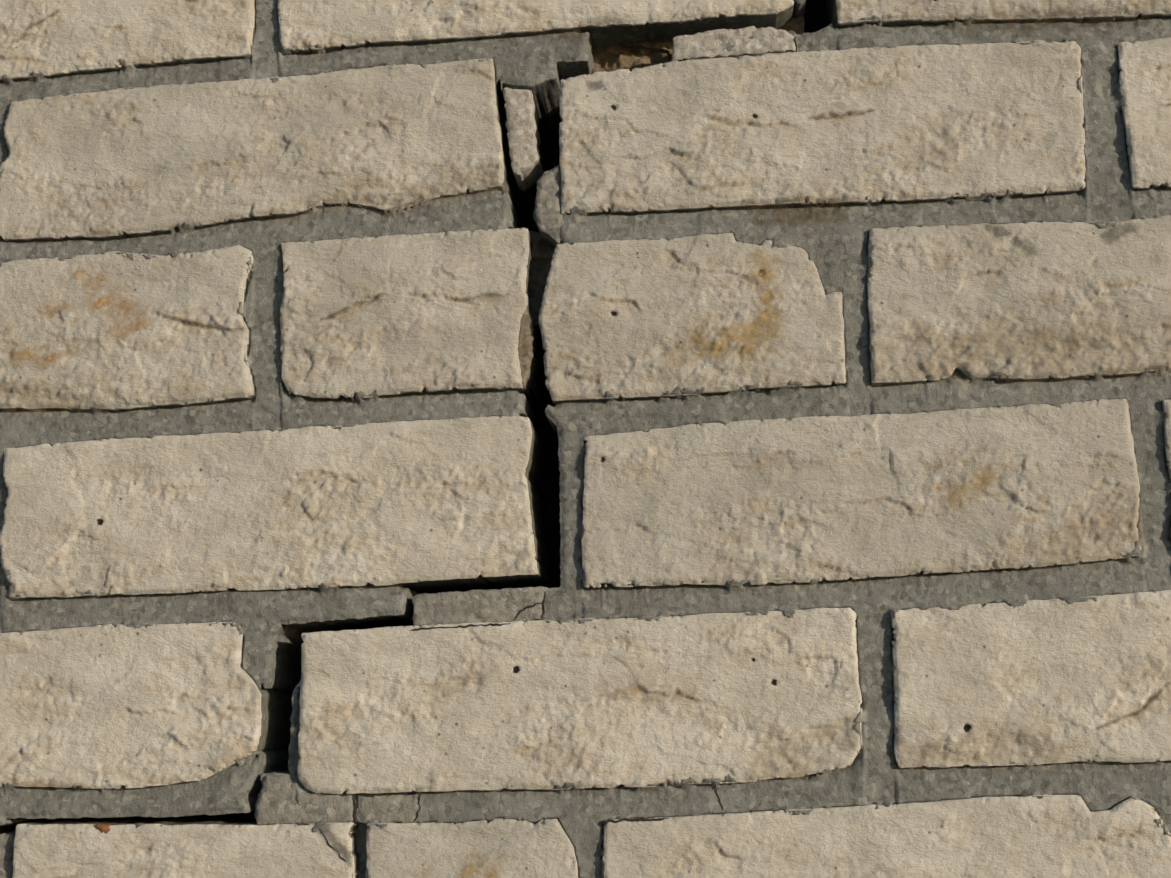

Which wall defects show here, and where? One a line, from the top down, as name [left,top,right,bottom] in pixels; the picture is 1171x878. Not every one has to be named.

crack [591,0,828,74]
crack [299,123,561,680]
crack [133,810,255,818]
crack [352,792,421,823]
crack [319,829,346,862]
crack [600,818,669,878]